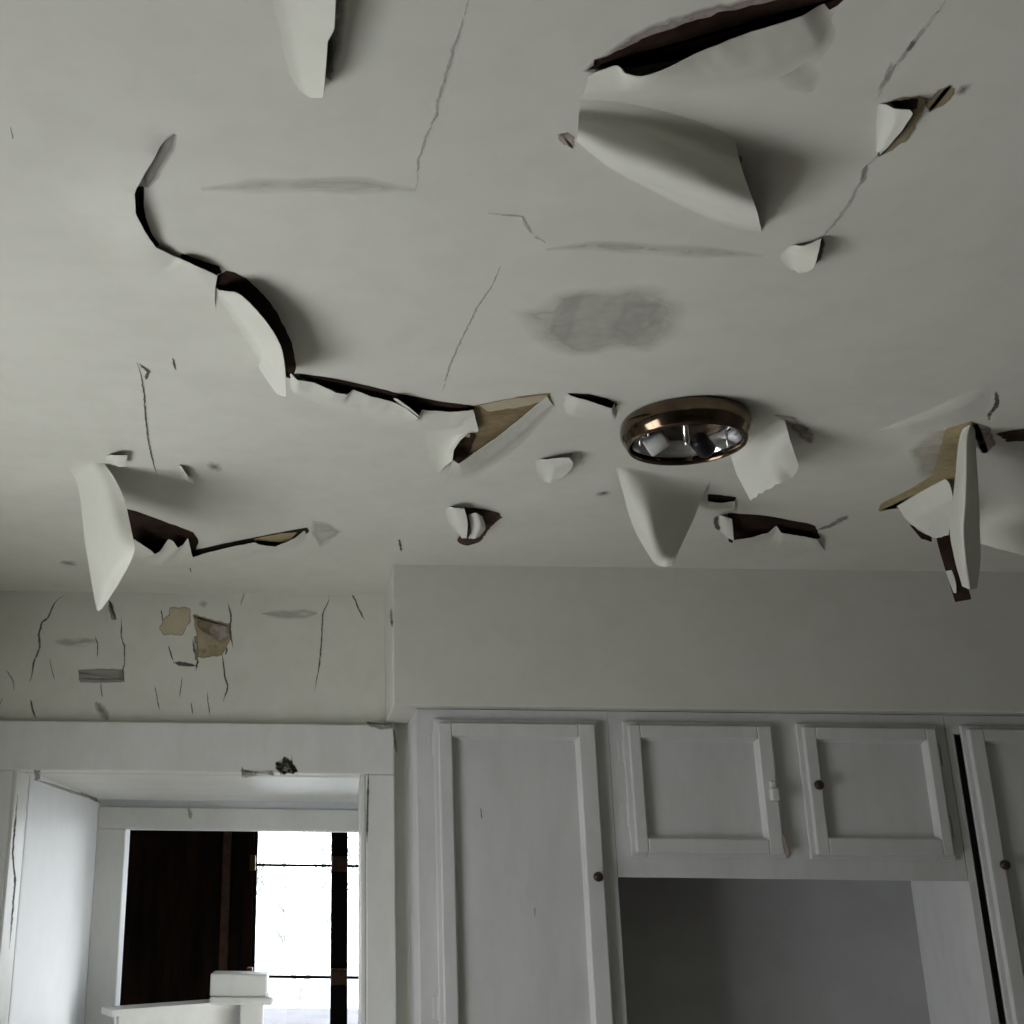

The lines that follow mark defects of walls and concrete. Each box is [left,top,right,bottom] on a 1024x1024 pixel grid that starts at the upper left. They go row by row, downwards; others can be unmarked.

peeling [273,0,342,98]
peeling [558,0,843,232]
crack [881,31,924,84]
peeling [49,124,618,485]
water stain [540,294,664,348]
crack [137,358,176,471]
peeling [69,455,309,622]
peeling [614,415,847,567]
peeling [879,421,1024,602]
crack [0,596,63,718]
crack [155,596,244,715]
crack [315,595,365,687]